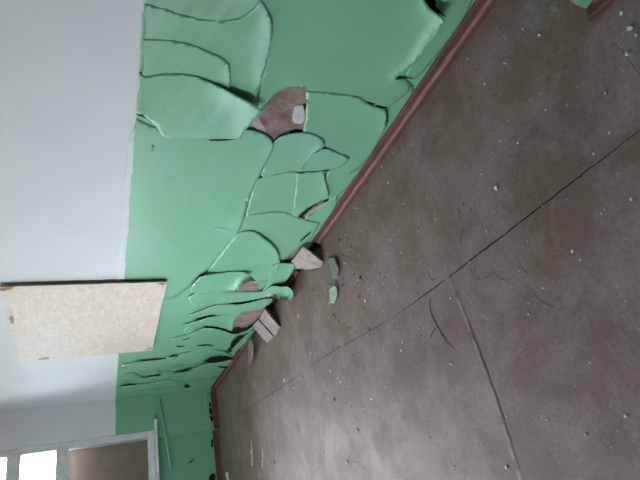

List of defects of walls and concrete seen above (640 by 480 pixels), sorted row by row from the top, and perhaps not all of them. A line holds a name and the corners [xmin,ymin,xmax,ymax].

peeling [116,0,472,391]
crack [235,130,640,417]